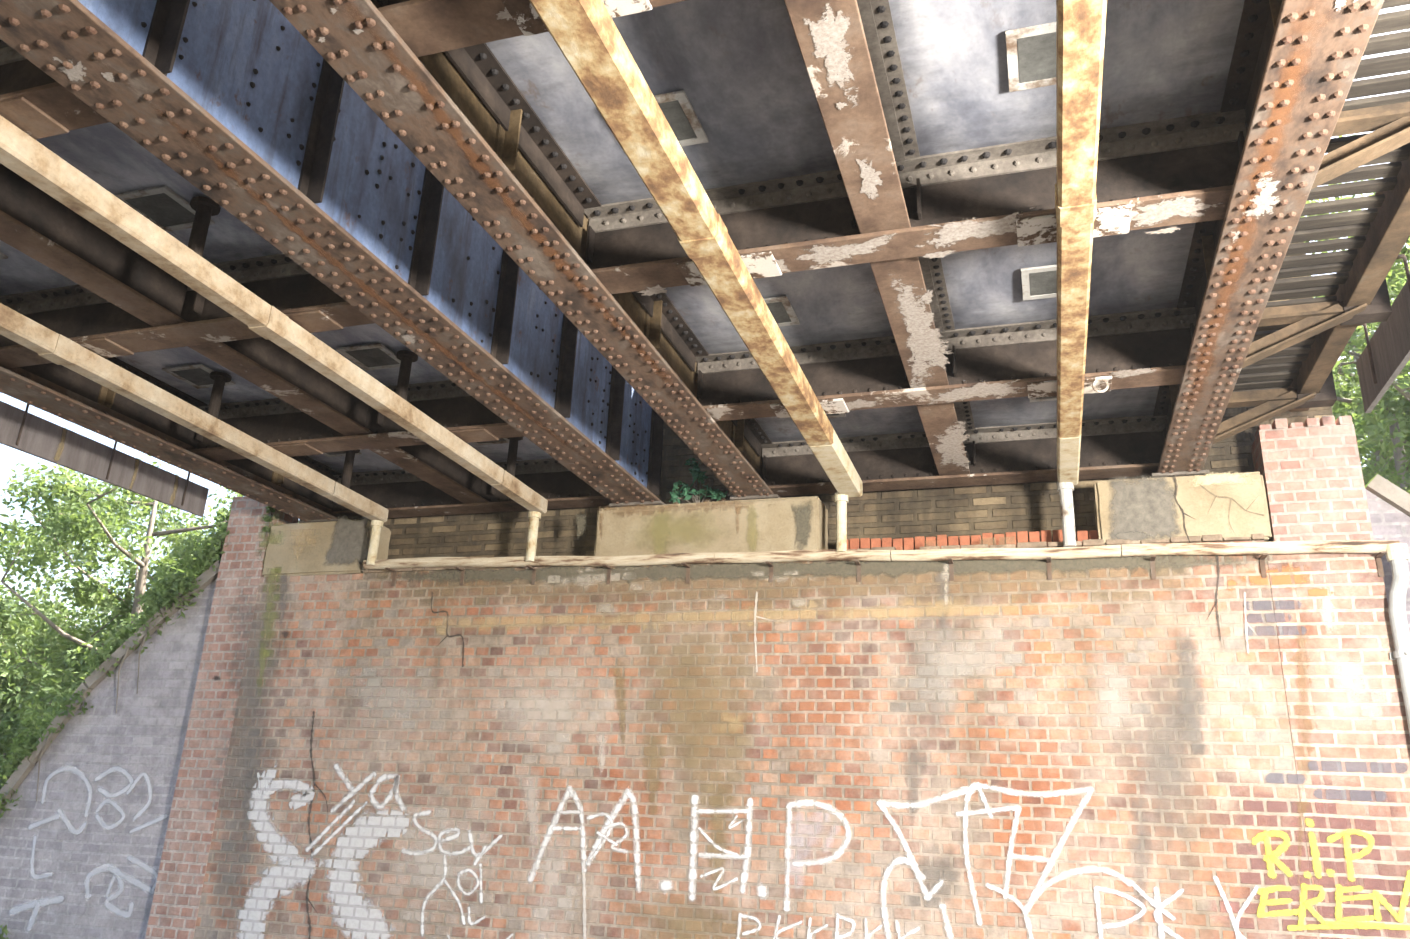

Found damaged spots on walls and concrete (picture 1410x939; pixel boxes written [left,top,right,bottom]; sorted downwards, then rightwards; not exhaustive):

peeling [804,3,859,110]
corrosion [400,64,668,380]
peeling [775,233,898,272]
peeling [856,159,883,200]
peeling [915,206,1036,259]
peeling [1130,194,1223,234]
peeling [1243,171,1280,219]
peeling [888,271,1027,471]
peeling [1109,368,1157,378]
crack [1173,475,1257,653]
crack [431,592,464,667]
crack [306,711,328,939]